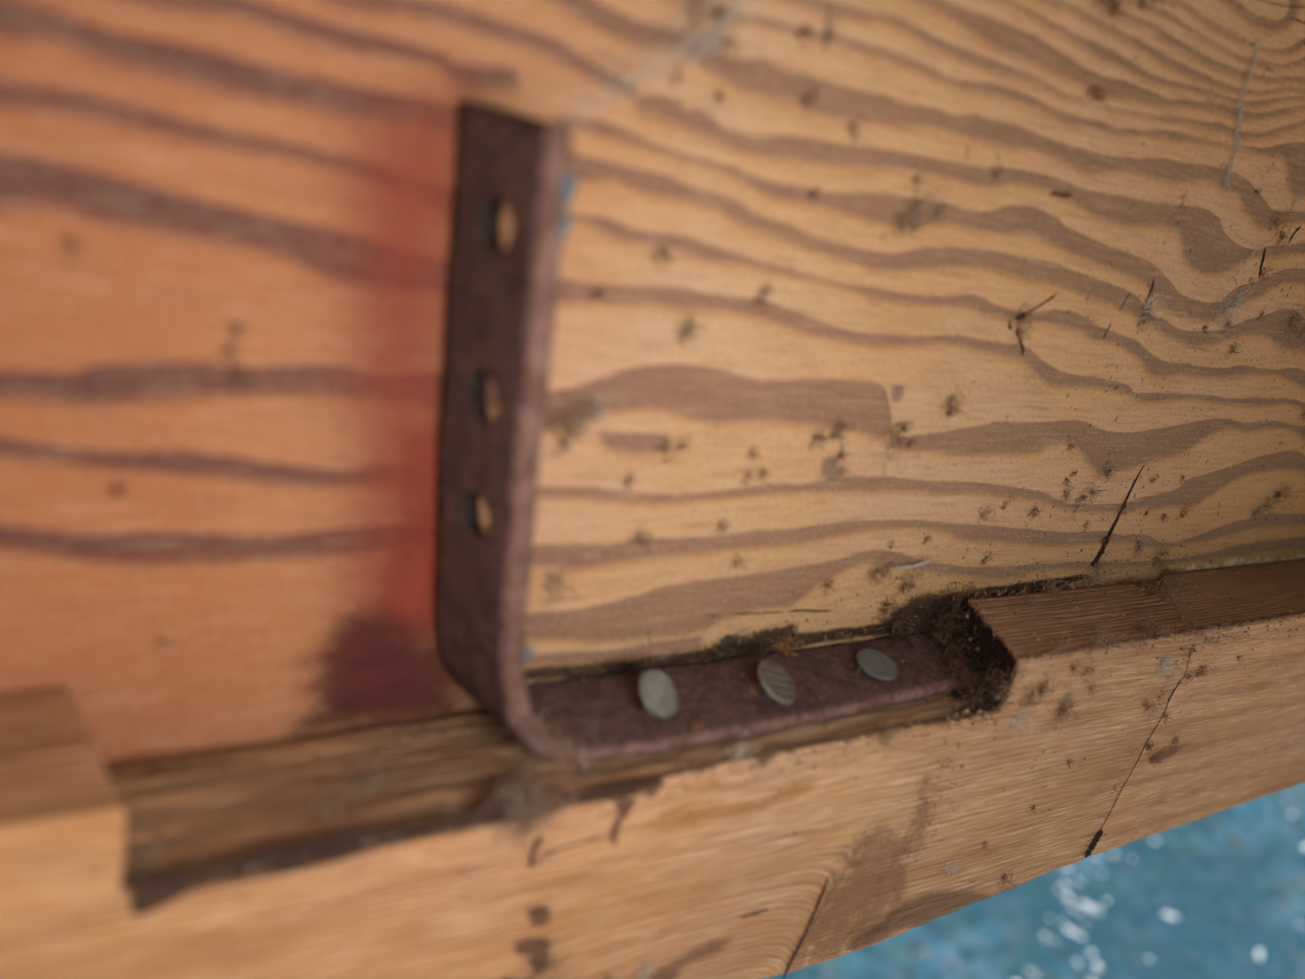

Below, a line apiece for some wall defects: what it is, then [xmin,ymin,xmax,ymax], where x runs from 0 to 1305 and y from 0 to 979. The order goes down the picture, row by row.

crack [1090,466,1144,567]
water stain [303,618,453,729]
crack [1082,655,1191,859]